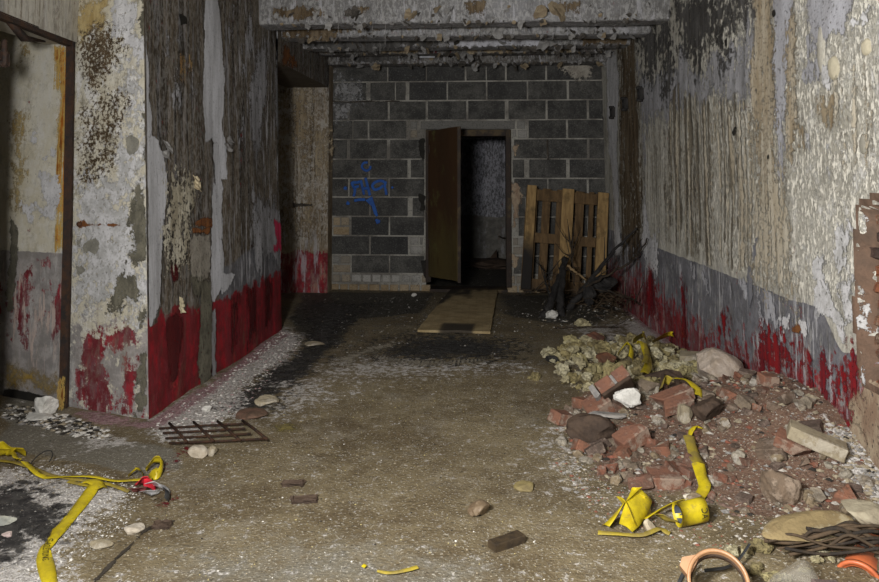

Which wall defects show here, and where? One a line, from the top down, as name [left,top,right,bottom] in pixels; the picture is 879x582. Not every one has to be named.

rust [53,45,75,253]
leakage [74,0,133,188]
peeling [61,0,173,338]
peeling [164,0,281,385]
peeling [280,1,644,259]
leakage [580,0,759,322]
peeling [767,0,793,181]
peeling [801,0,875,91]
leakage [166,313,183,382]
peeling [726,276,807,337]
flaking render [812,193,879,469]